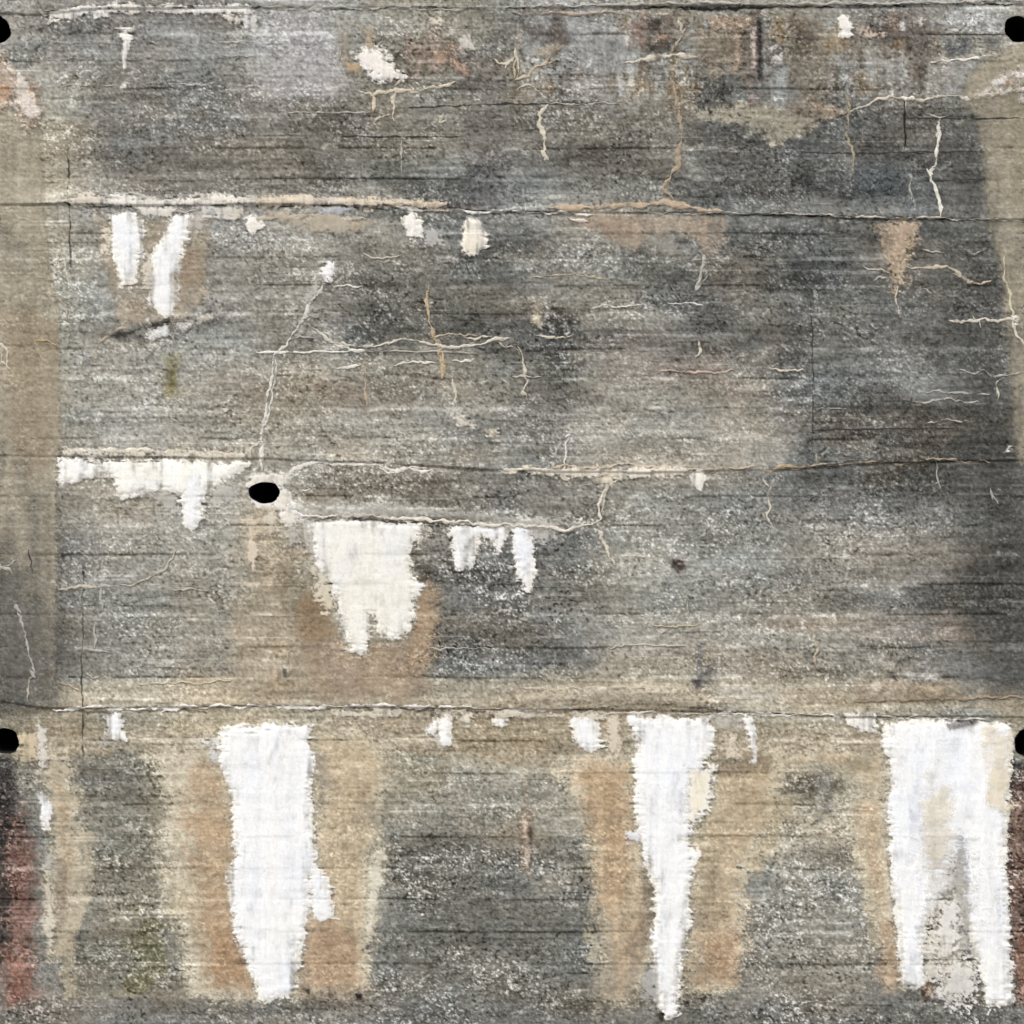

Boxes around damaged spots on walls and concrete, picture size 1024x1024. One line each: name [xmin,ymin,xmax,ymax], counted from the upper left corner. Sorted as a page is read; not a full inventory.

water stain [0,109,556,774]
crack [44,0,1024,309]
crack [58,284,1024,565]
water stain [522,464,710,491]
water stain [698,100,817,148]
crack [864,249,1024,345]
water stain [946,37,1024,467]
water stain [38,795,53,831]
water stain [40,854,57,955]
efflorescence [195,721,340,1004]
efflorescence [415,708,758,1020]
efflorescence [844,710,1019,1024]